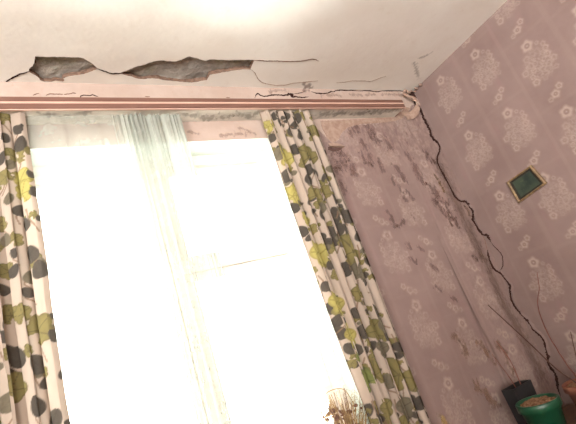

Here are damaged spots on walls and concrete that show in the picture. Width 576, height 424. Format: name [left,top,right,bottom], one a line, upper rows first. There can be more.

spalling [29,56,97,82]
spalling [121,57,254,83]
crack [252,59,561,396]